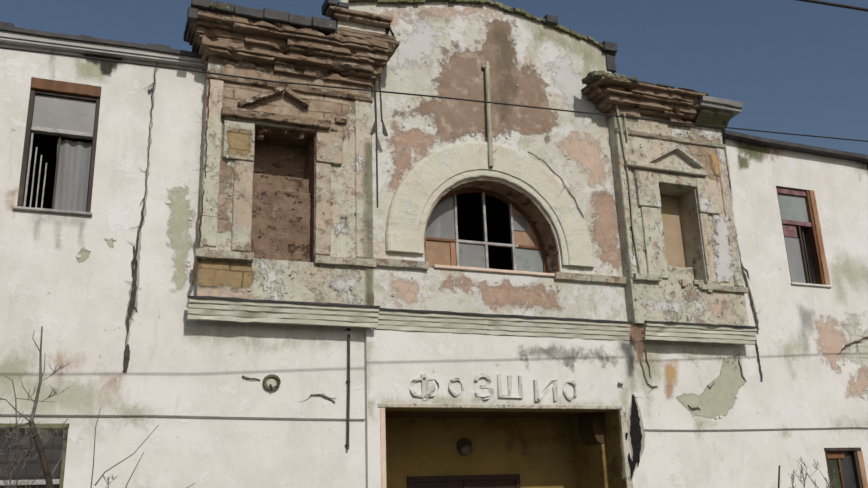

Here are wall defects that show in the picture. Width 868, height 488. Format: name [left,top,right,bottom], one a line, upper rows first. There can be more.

crack [123,63,159,372]
crack [191,71,212,285]
flaking render [166,186,260,300]
flaking render [391,274,419,308]
flaking render [439,274,562,313]
flaking render [381,4,622,272]
crack [528,151,584,218]
crack [625,350,658,481]
flaking render [677,354,747,419]
crack [722,138,763,381]
flaking render [816,314,868,399]
crack [838,333,868,354]